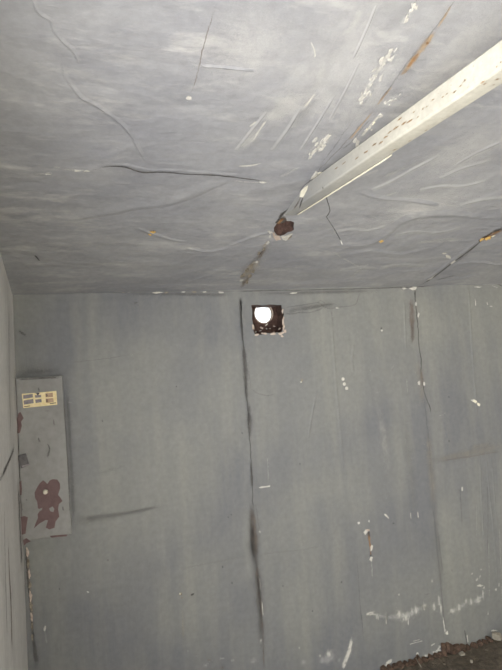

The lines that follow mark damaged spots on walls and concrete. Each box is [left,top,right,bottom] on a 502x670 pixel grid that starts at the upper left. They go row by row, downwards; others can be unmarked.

crack [186,12,214,100]
peeling [357,44,399,105]
rust [399,9,450,76]
peeling [353,93,401,147]
crack [40,162,266,183]
crack [122,232,502,664]